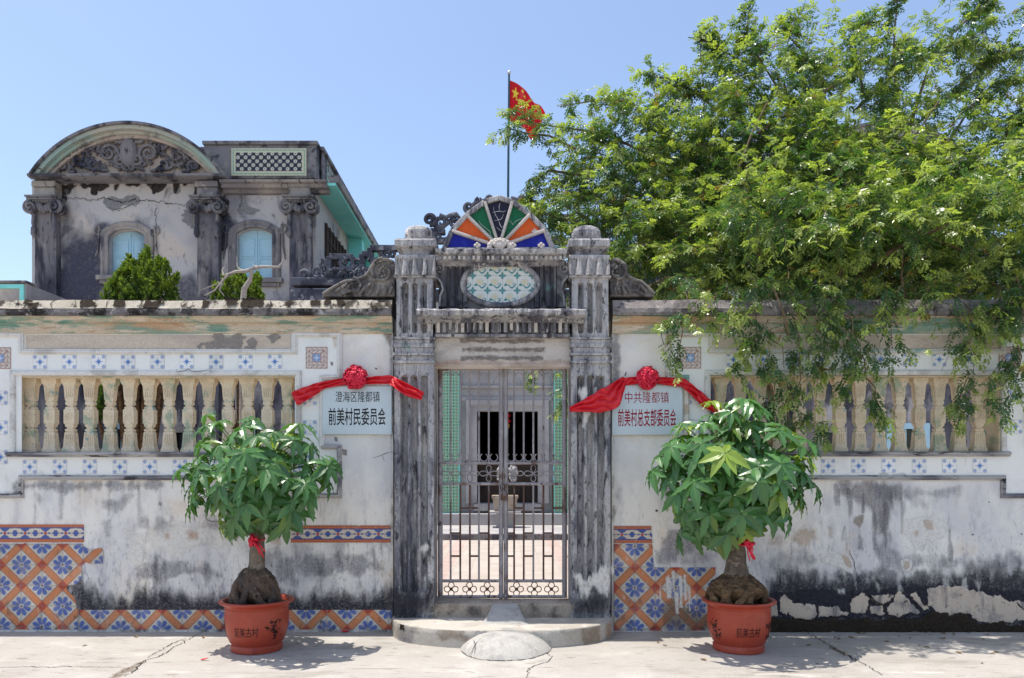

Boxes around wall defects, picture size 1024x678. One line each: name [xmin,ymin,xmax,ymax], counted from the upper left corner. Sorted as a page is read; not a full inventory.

spalling [103,194,140,210]
crack [71,197,186,225]
damp [61,215,110,300]
damp [175,277,197,301]
spalling [197,333,281,349]
damp [67,583,226,610]
damp [278,560,435,618]
damp [574,592,610,644]
damp [769,553,1024,603]
spalling [770,583,1024,624]